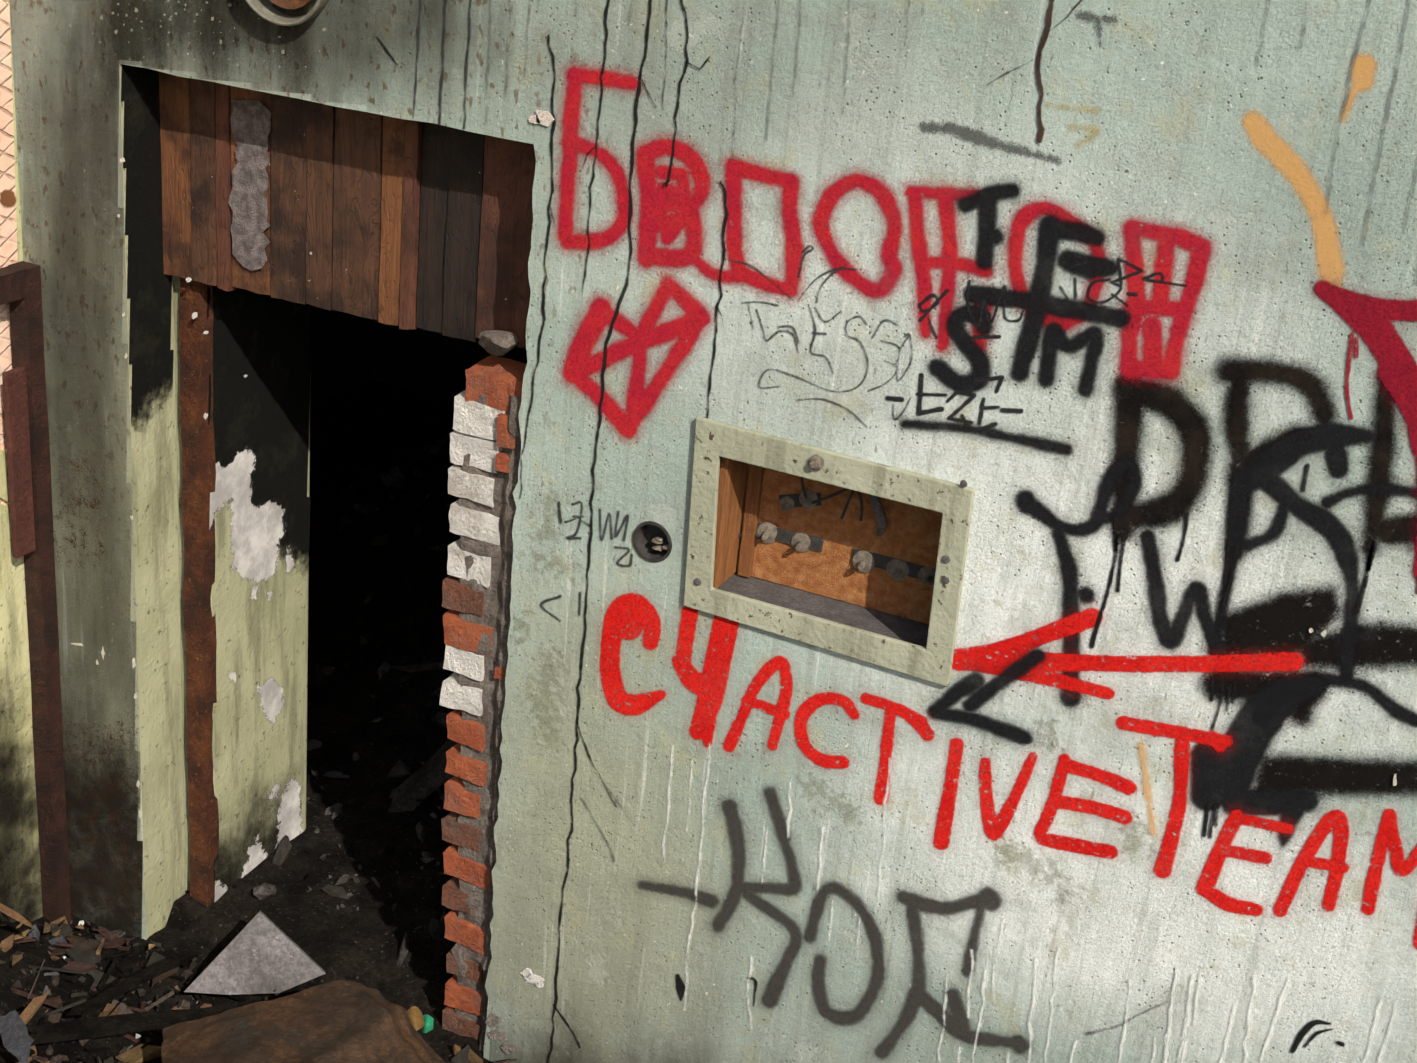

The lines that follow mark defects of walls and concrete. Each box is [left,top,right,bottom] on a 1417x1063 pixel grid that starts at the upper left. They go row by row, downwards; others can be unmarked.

crack [989,0,1082,143]
peeling [209,449,294,601]
spalling [439,330,527,1054]
crack [519,0,710,1063]